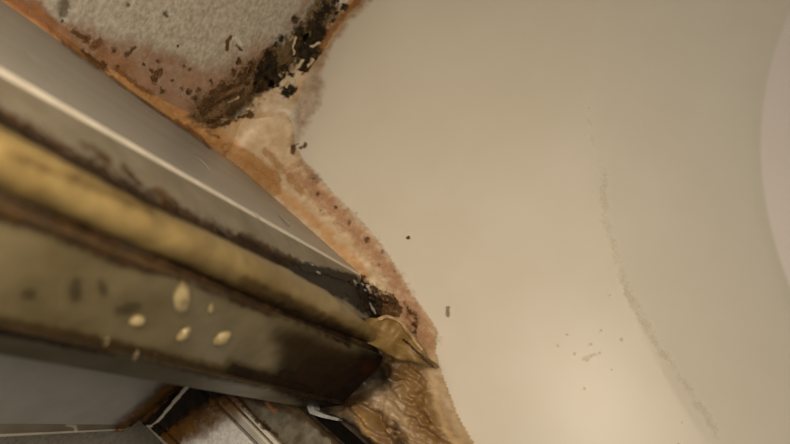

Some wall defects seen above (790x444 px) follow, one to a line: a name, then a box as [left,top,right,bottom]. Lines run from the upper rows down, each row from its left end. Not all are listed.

corrosion [12,0,136,74]
damp [62,0,363,196]
damp [0,198,383,407]
damp [0,108,429,337]